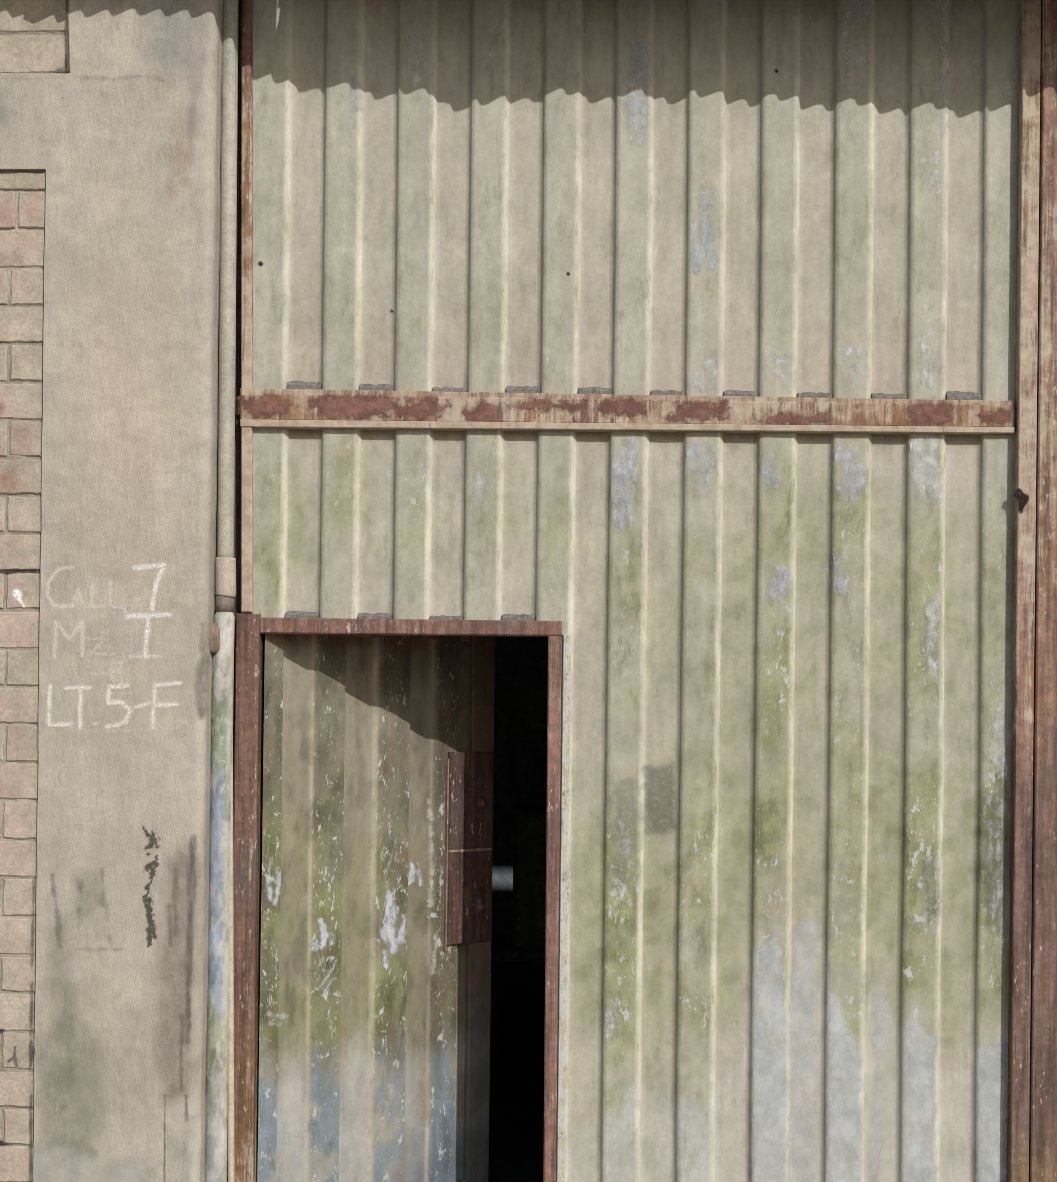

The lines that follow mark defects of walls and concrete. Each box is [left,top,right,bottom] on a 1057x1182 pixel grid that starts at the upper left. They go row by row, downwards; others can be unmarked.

rust [309,394,647,422]
rust [668,399,729,424]
rust [759,411,828,425]
rust [907,403,953,426]
spalling [267,871,281,905]
spalling [408,800,443,907]
spalling [318,918,334,950]
spalling [380,893,406,969]
water stain [142,826,196,1121]
water stain [754,937,818,1182]
water stain [830,1013,881,1182]
water stain [980,1046,1008,1182]